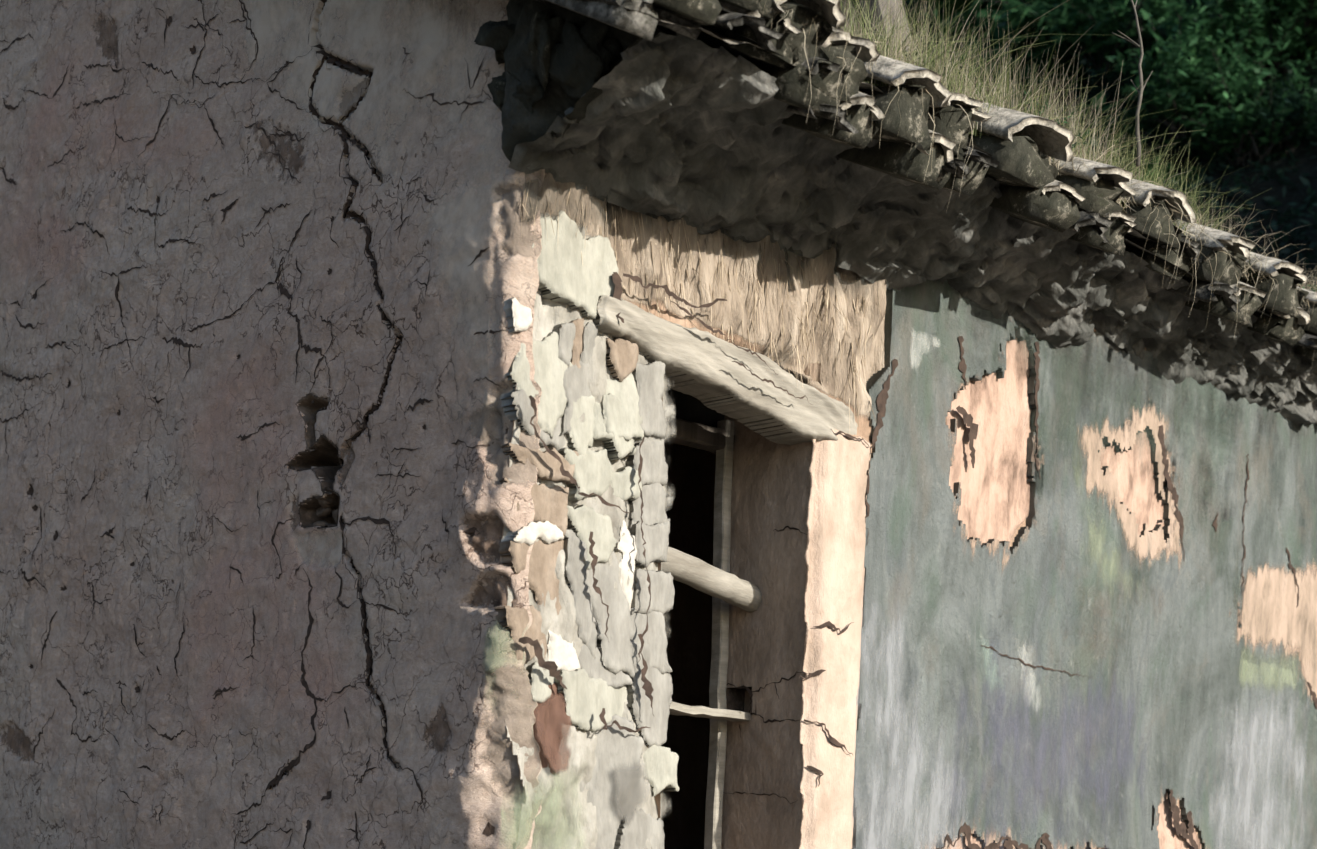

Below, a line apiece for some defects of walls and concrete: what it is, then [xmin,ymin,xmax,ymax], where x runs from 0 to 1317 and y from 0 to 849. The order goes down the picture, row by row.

crack [0,505,195,823]
crack [0,0,492,478]
crack [133,492,423,849]
crack [474,328,506,336]
peeling [462,184,679,849]
peeling [946,328,1044,565]
peeling [1078,399,1182,566]
peeling [1237,563,1317,702]
peeling [925,829,1023,849]
peeling [1157,792,1204,849]